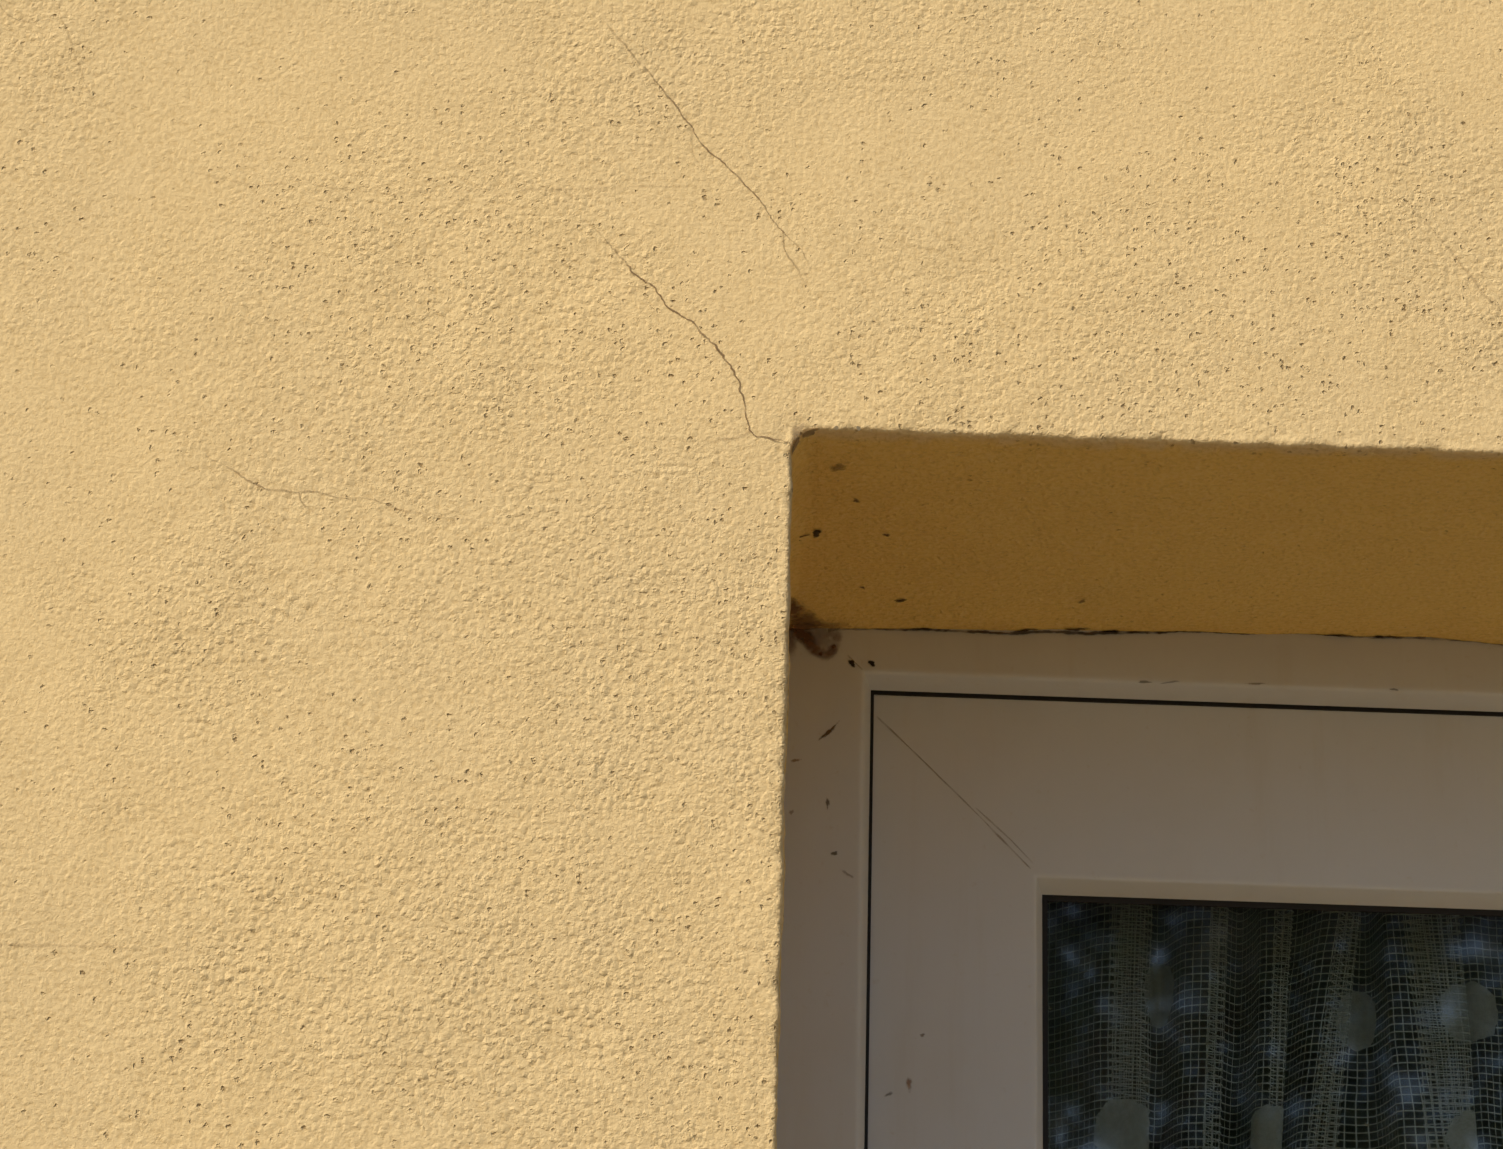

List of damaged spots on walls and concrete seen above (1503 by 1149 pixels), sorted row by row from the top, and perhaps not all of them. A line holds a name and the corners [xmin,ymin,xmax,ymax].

crack [673,101,772,219]
crack [628,266,794,445]